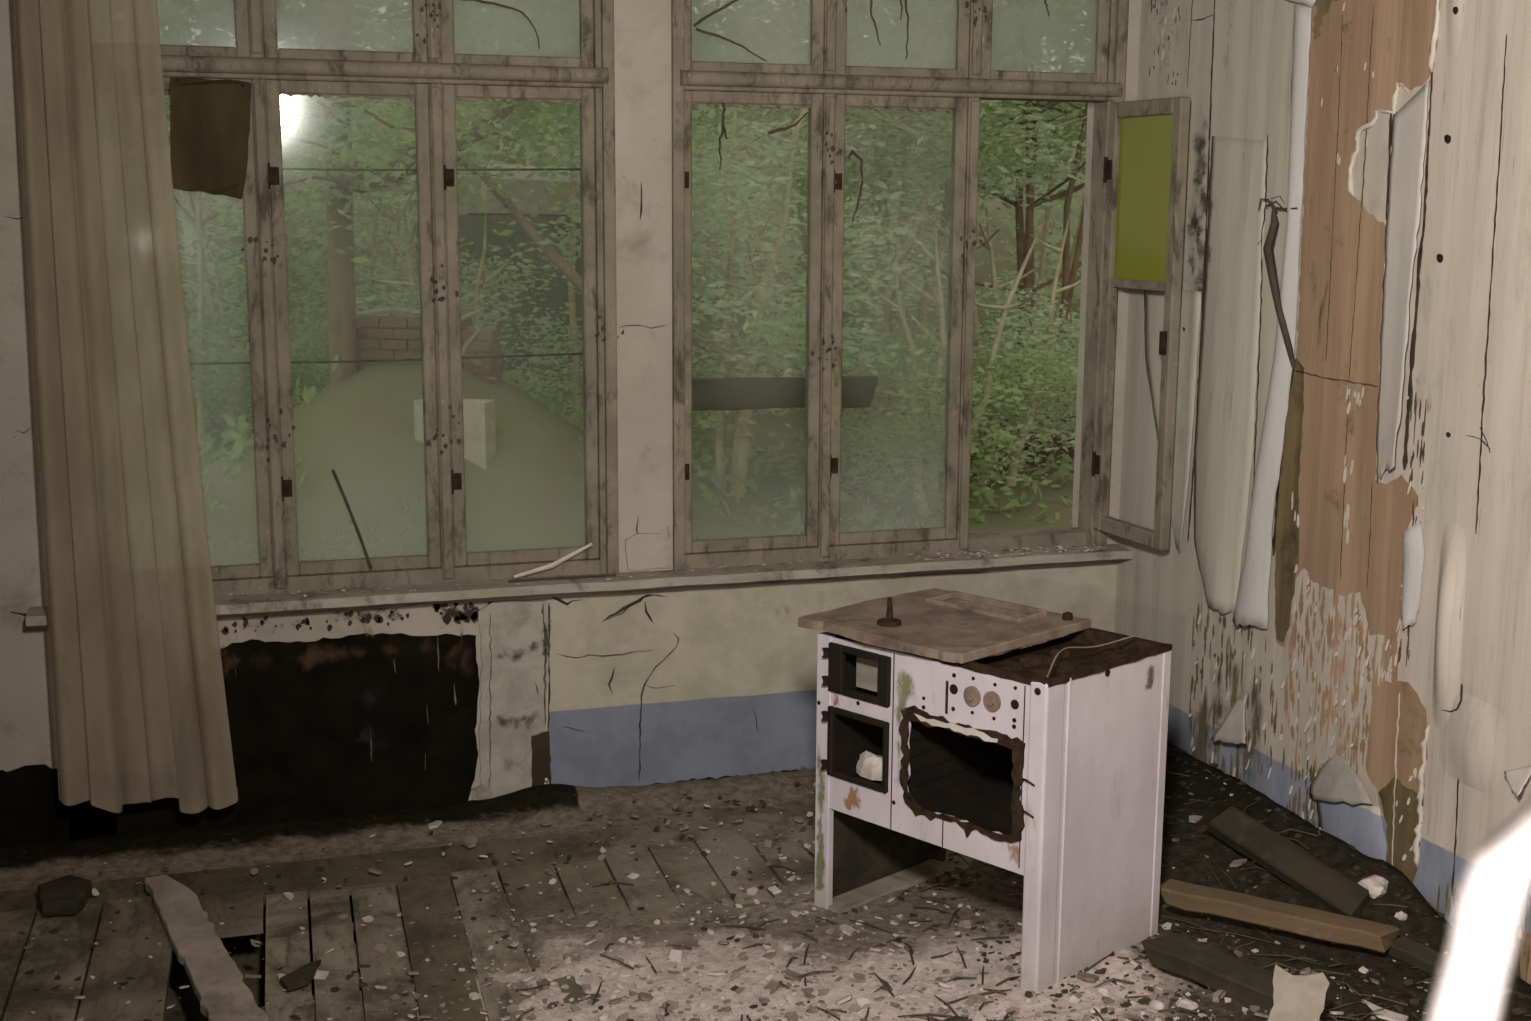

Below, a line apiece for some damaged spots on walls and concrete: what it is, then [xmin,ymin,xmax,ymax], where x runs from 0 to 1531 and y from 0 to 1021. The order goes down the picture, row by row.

peeling [1143,0,1440,884]
flaking render [0,633,479,846]
flaking render [531,731,552,786]
crack [548,594,679,777]